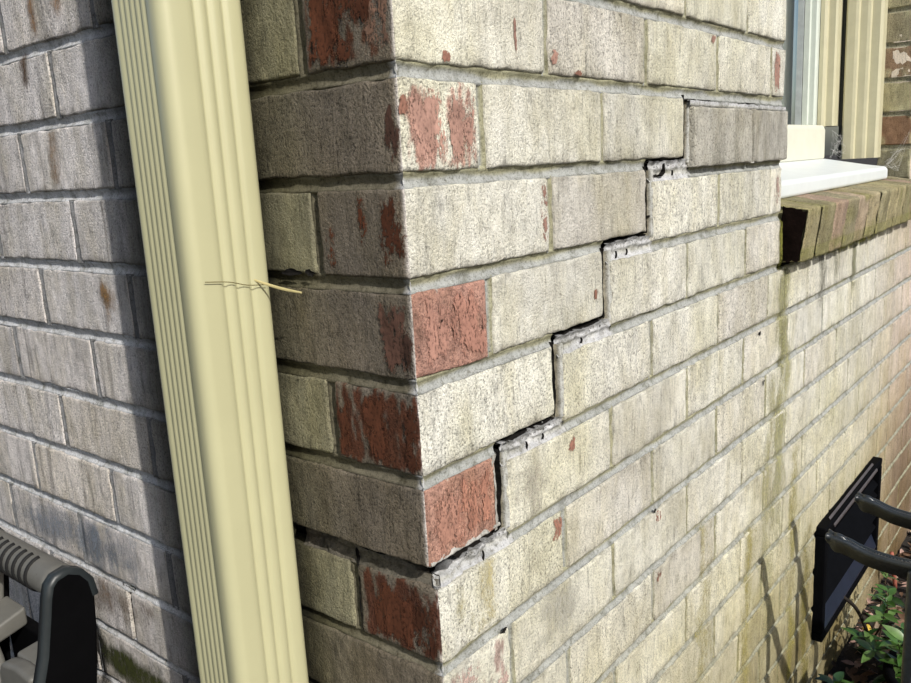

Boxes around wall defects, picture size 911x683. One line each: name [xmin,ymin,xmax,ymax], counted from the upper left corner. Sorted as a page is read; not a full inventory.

damp [97,630,110,683]
crack [355,546,386,630]
crack [428,95,711,569]
damp [742,272,809,683]